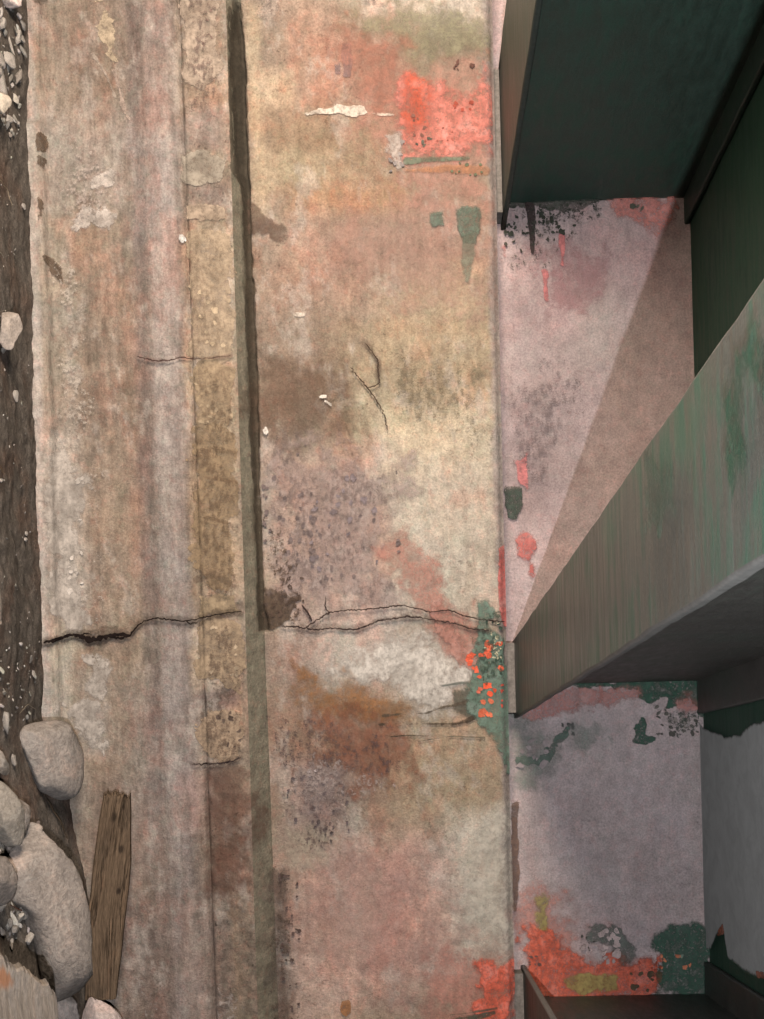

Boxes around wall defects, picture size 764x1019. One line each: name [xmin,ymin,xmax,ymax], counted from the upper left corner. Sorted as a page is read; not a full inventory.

crack [351,343,388,430]
peeling [515,533,537,573]
crack [44,611,241,643]
crack [282,597,505,632]
peeling [430,546,575,774]
peeling [573,681,704,745]
peeling [451,959,515,1019]
peeling [515,922,724,997]